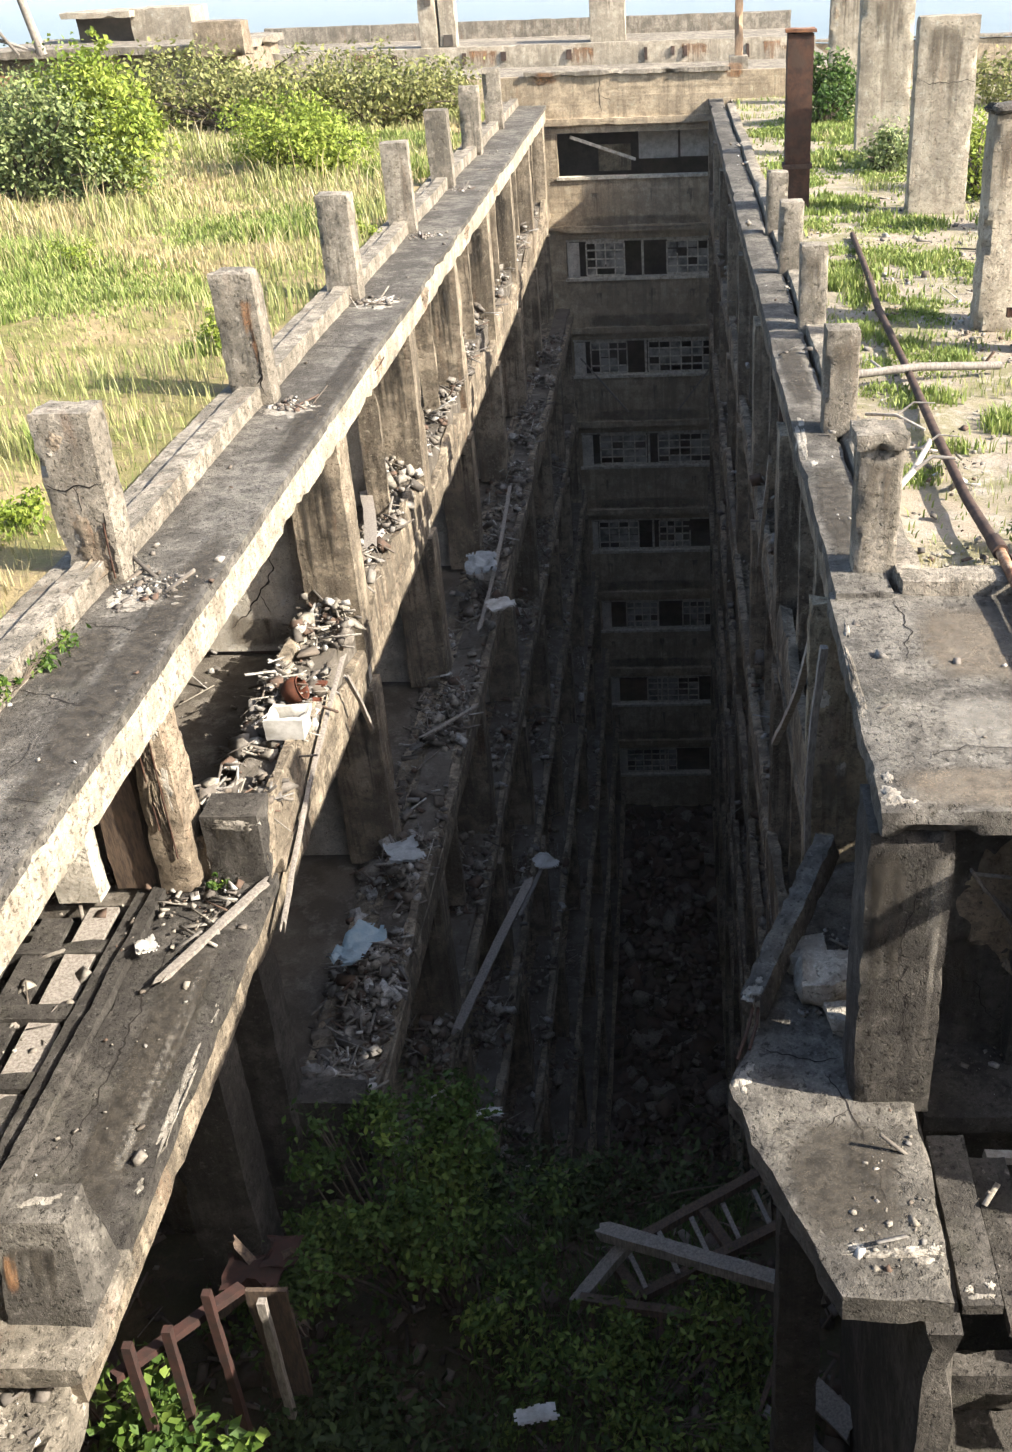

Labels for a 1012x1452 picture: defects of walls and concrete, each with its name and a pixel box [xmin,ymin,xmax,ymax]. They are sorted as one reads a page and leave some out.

crack [48,484,119,574]
flaking render [956,839,1012,975]
crack [898,863,919,1055]
crack [764,1048,864,1133]
corrosion [4,1259,18,1288]